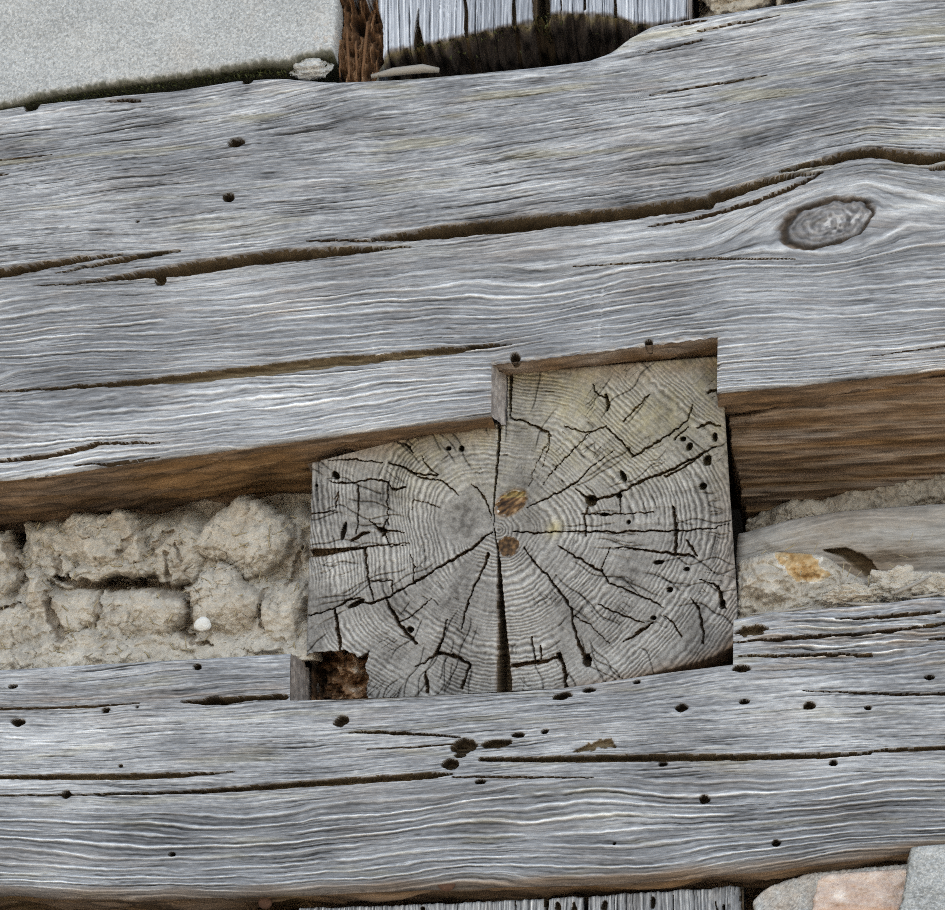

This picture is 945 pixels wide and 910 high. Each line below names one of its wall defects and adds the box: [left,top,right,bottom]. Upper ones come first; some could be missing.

crack [463,0,477,74]
crack [512,0,586,69]
crack [613,0,621,48]
crack [0,148,945,286]
crack [0,343,509,392]
crack [257,376,727,694]
crack [350,730,460,750]
crack [0,746,945,799]